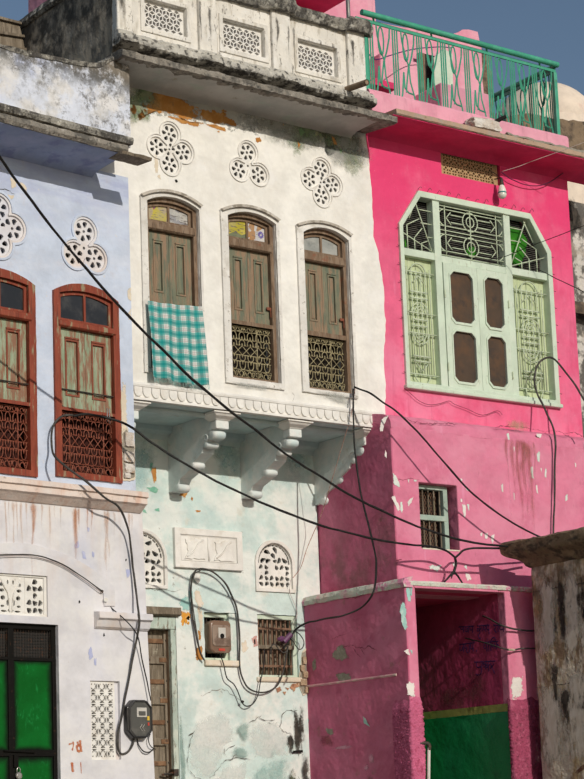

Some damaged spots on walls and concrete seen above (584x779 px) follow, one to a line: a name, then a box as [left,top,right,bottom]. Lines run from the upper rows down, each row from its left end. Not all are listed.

peeling [130,87,272,143]
peeling [400,587,412,630]
damp [538,576,584,653]
damp [287,710,304,753]
damp [540,663,584,764]
crack [182,733,247,779]
damp [257,759,310,779]